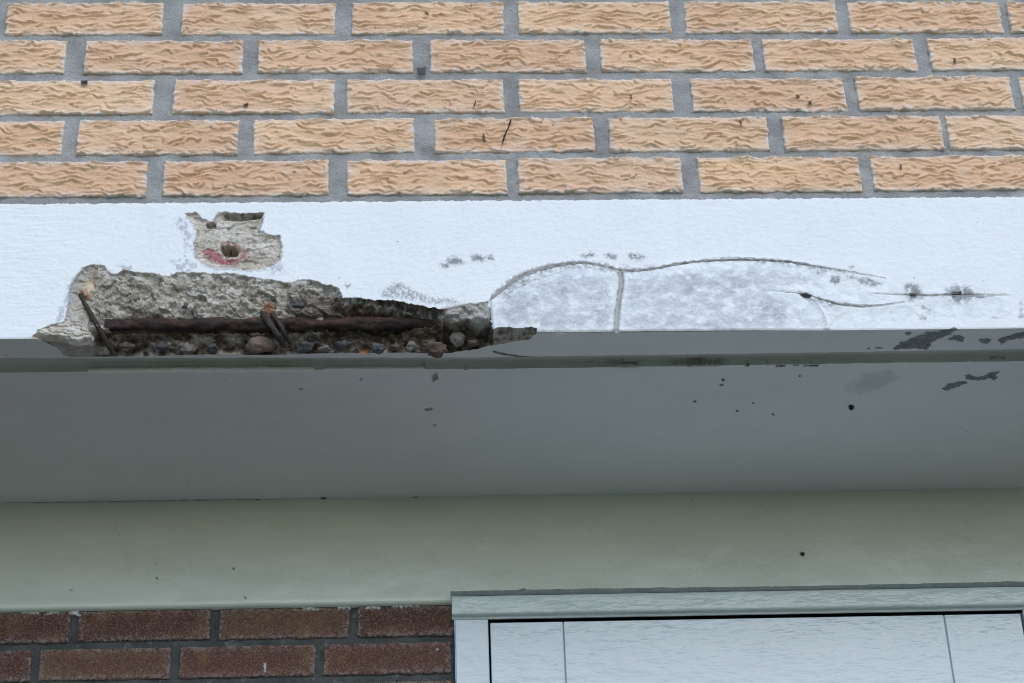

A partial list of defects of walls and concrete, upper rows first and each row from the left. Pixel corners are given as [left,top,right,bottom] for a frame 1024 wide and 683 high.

spalling [32,211,537,358]
crack [490,257,1005,333]
peeling [867,327,965,350]
peeling [979,332,1024,344]
peeling [942,372,998,391]